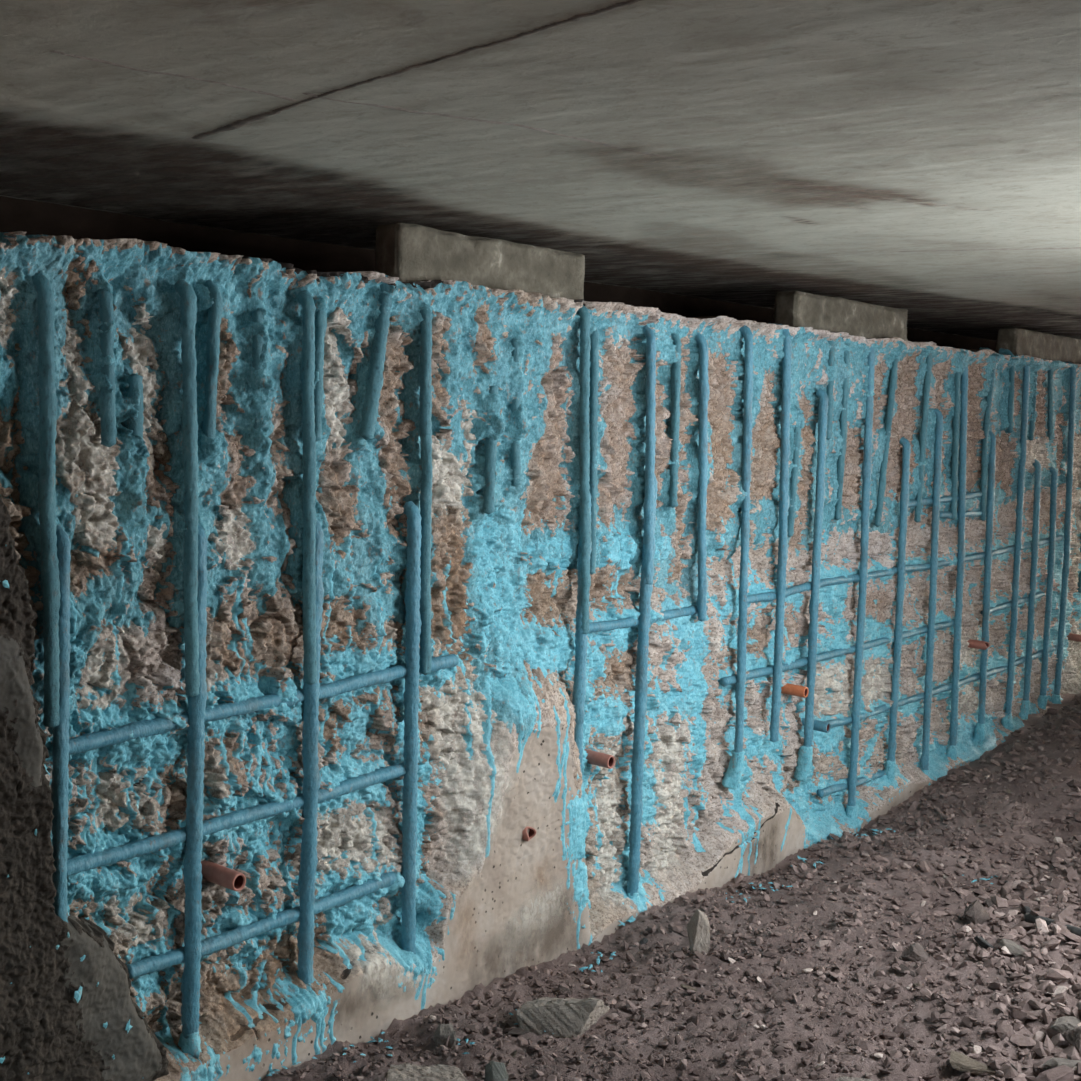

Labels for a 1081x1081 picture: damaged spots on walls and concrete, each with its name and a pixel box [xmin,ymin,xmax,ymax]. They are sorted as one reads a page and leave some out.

spalling [0,231,1081,1081]
crack [701,803,780,876]